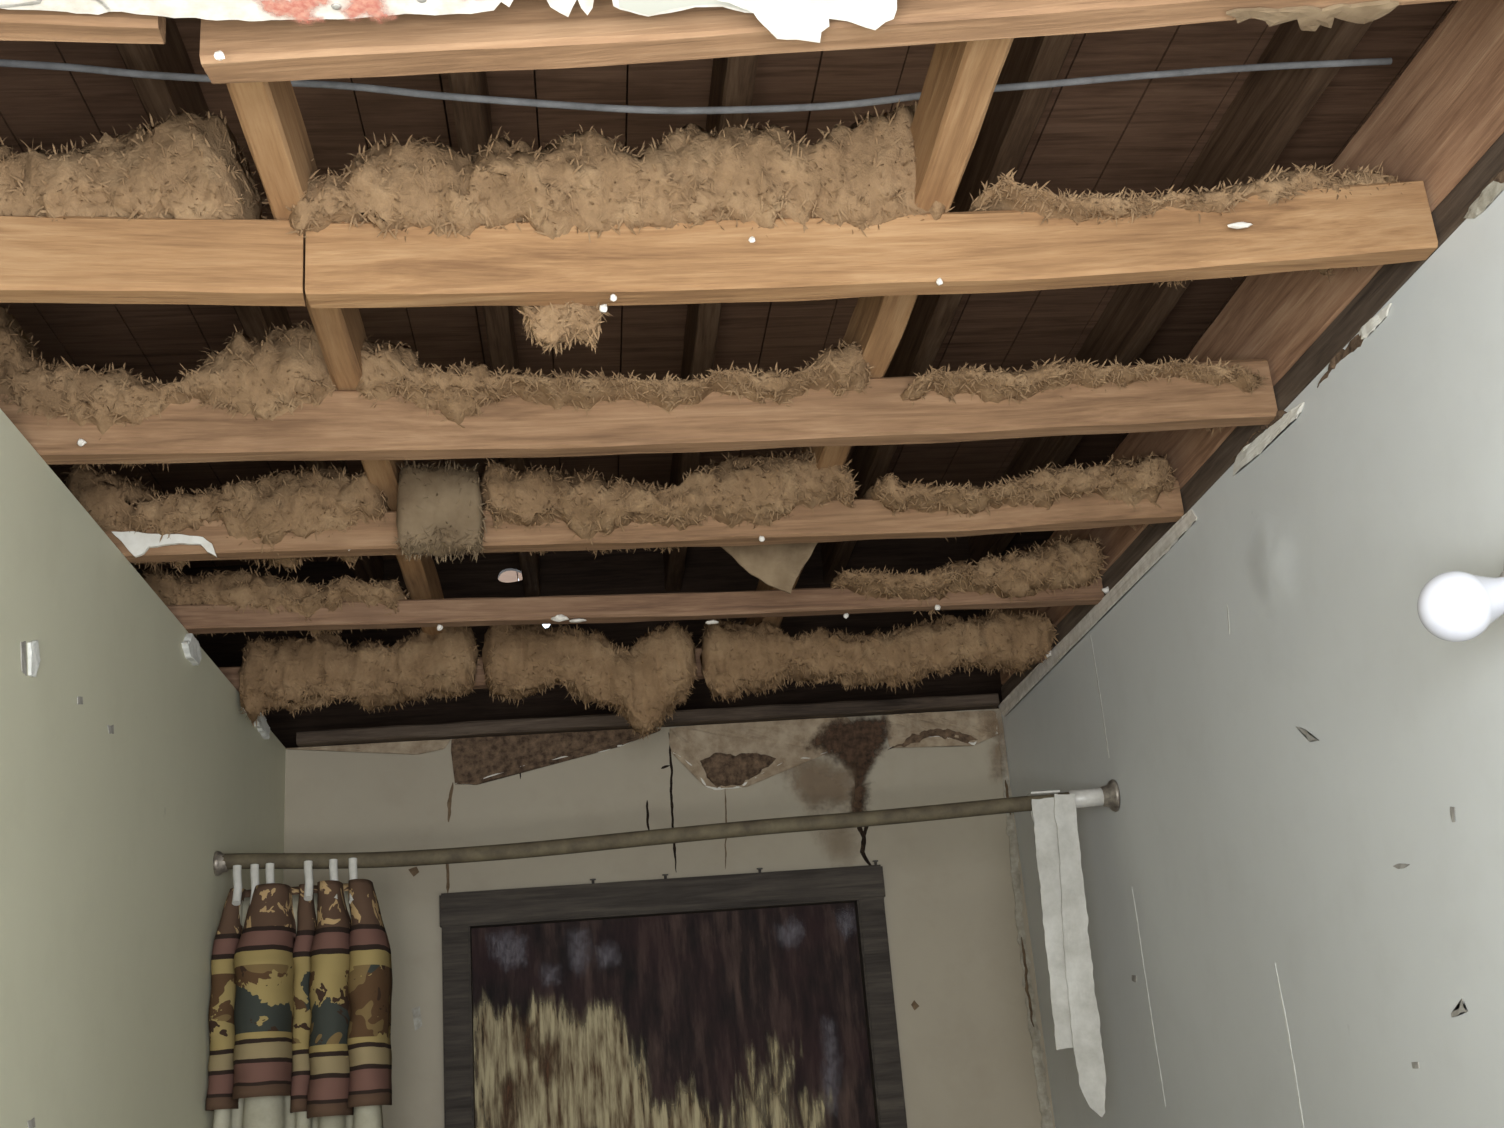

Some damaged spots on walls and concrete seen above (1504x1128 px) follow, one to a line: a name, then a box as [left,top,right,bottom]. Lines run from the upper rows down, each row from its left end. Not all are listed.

flaking render [1486,169,1504,187]
flaking render [1317,334,1364,388]
flaking render [1232,410,1287,460]
peeling [20,640,40,677]
peeling [181,633,202,666]
peeling [243,708,270,739]
flaking render [285,717,850,790]
water stain [797,716,888,812]